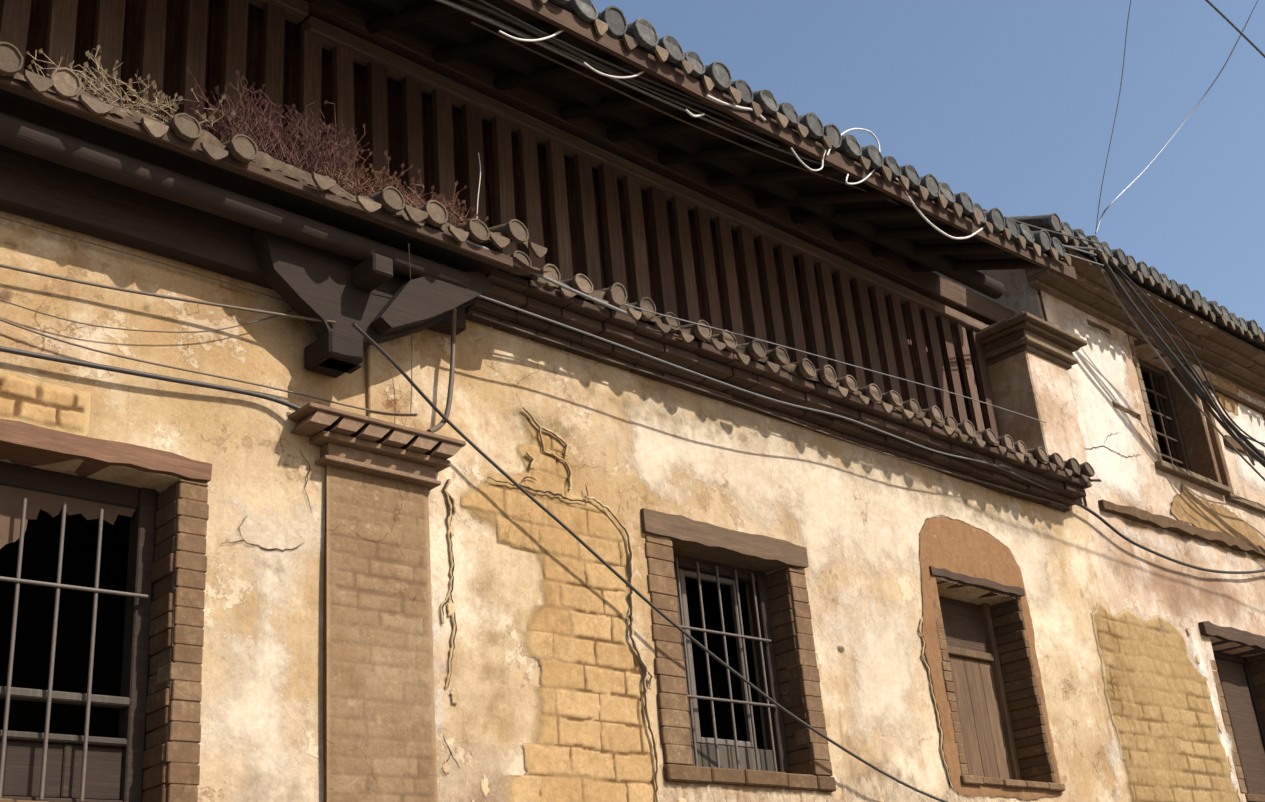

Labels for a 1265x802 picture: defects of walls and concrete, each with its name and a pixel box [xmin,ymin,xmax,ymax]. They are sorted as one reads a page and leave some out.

spalling [0,371,92,437]
crack [1085,432,1140,458]
crack [300,450,312,514]
crack [221,516,303,551]
spalling [1171,483,1265,563]
spalling [438,408,993,802]
spalling [1092,603,1242,802]